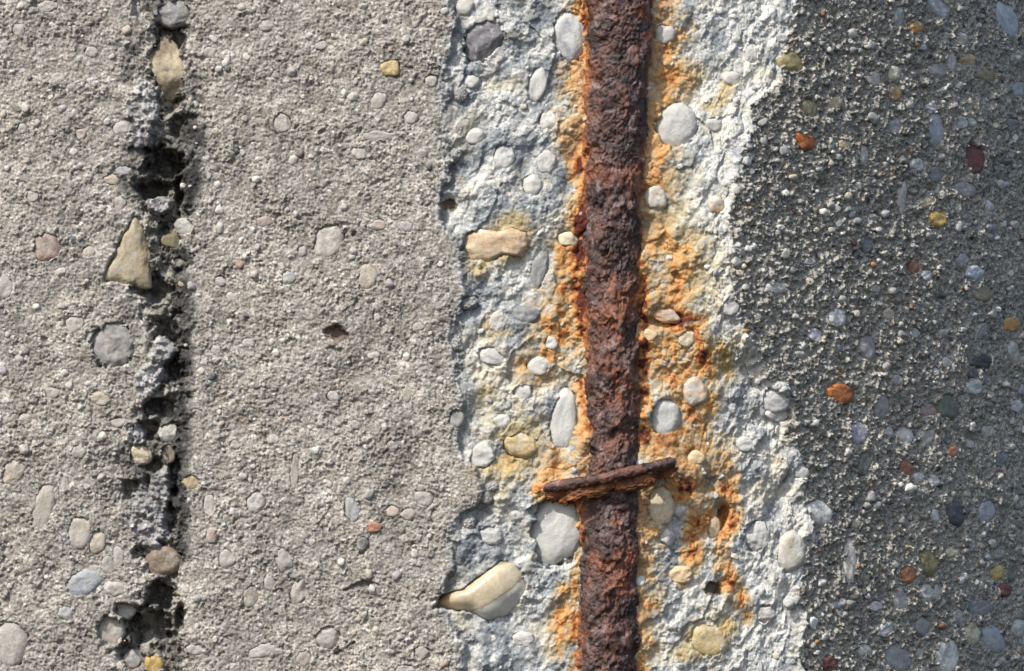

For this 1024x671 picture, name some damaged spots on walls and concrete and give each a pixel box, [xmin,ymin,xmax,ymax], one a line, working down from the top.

crack [116,0,196,671]
spalling [434,0,818,671]
corrosion [513,0,753,671]